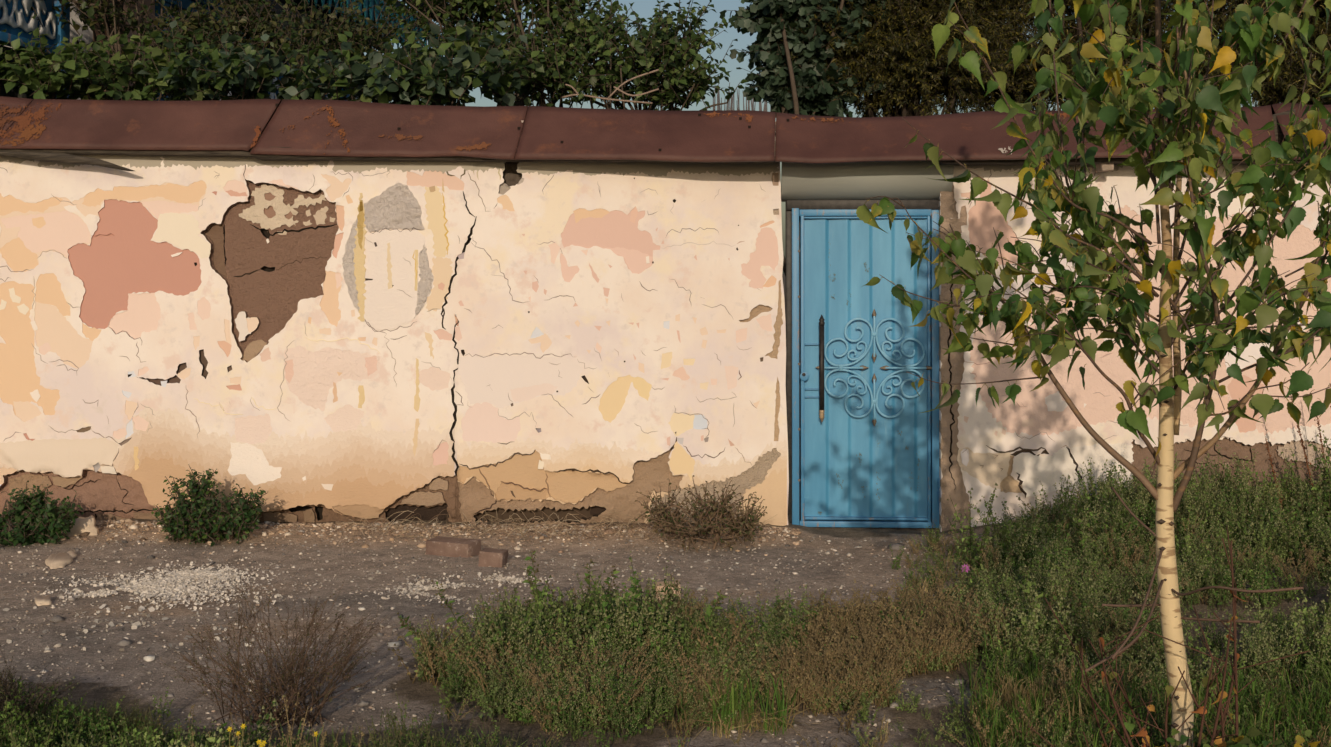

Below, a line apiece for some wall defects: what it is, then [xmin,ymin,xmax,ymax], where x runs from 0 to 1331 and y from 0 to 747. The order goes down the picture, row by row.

rust [0,103,61,146]
crack [198,165,390,277]
crack [365,173,756,514]
peeling [560,206,664,302]
peeling [599,209,783,423]
peeling [938,180,1331,531]
spalling [0,467,175,519]
peeling [252,377,781,525]